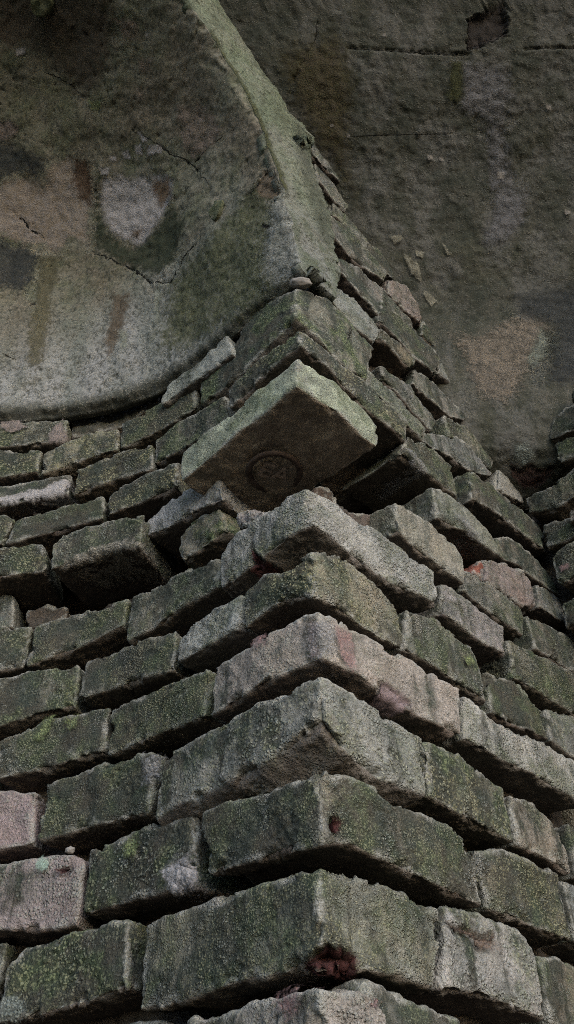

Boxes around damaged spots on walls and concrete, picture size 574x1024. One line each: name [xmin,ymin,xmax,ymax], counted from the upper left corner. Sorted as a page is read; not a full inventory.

spalling [467,4,509,50]
crack [139,133,222,184]
crack [94,245,194,284]